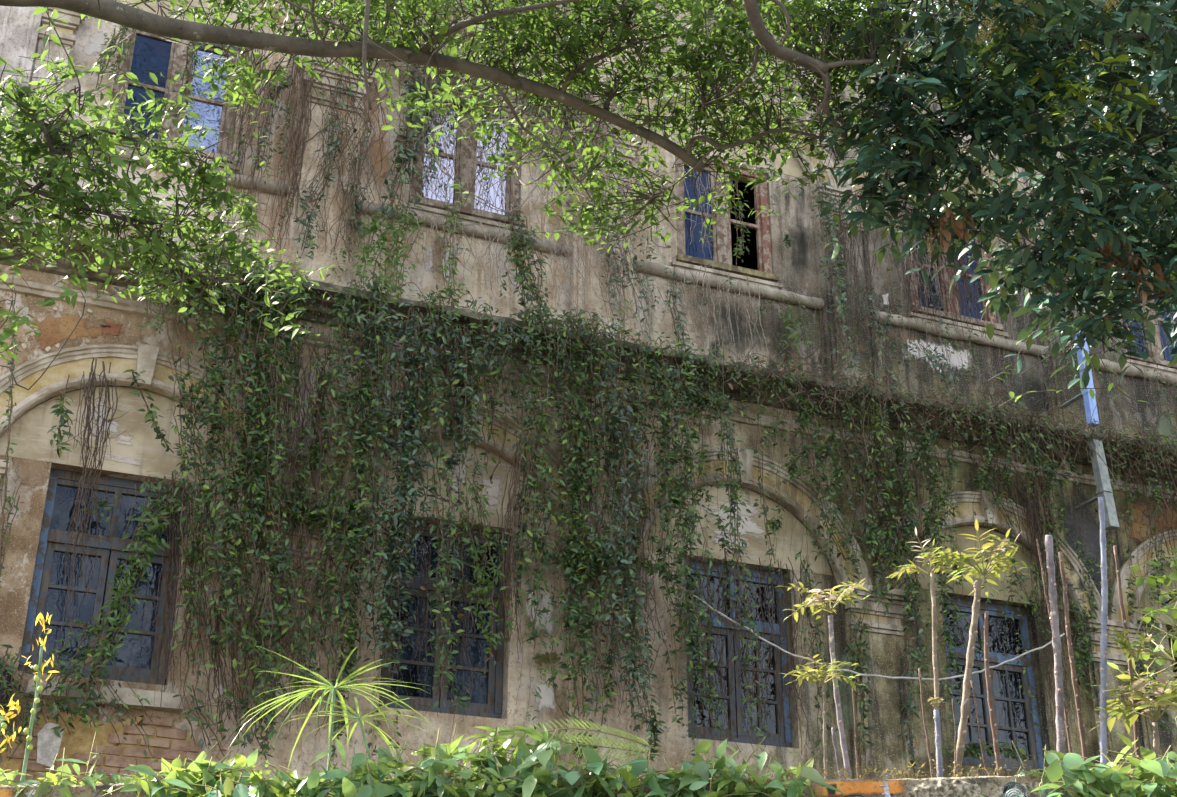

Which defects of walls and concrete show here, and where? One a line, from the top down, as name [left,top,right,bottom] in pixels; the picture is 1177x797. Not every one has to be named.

peeling [13,306,123,352]
peeling [905,339,971,373]
mould [0,658,16,726]
spalling [1,680,200,797]